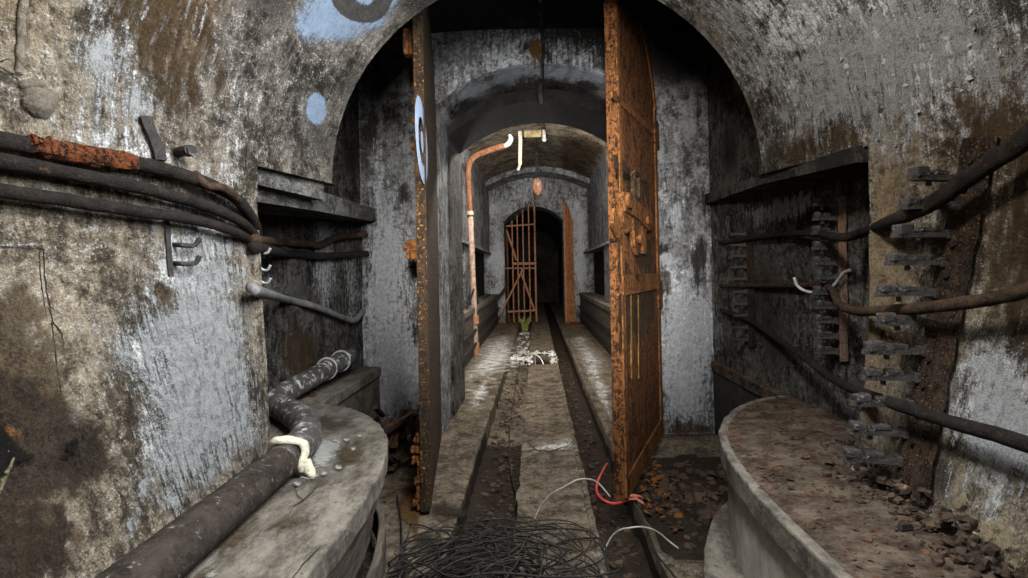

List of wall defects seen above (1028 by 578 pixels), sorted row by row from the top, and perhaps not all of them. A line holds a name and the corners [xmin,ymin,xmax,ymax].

efflorescence [66,28,161,128]
water stain [0,275,116,578]
water stain [118,224,267,539]
water stain [319,414,365,470]